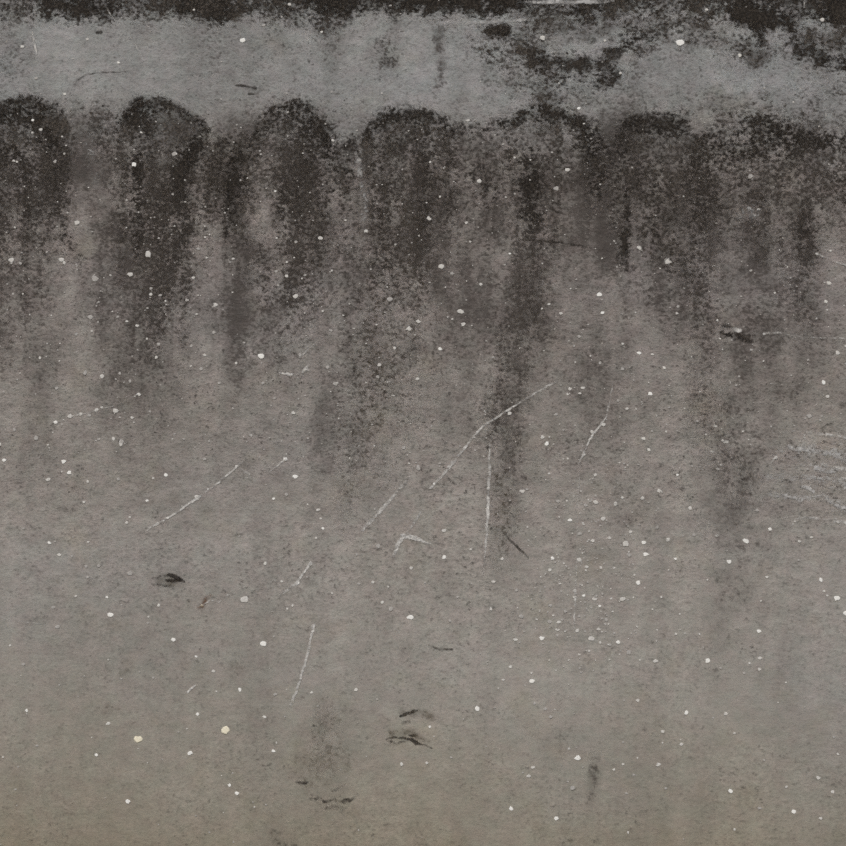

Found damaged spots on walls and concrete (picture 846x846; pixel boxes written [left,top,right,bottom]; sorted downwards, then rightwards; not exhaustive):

leakage [0,0,846,480]
leakage [788,445,846,493]